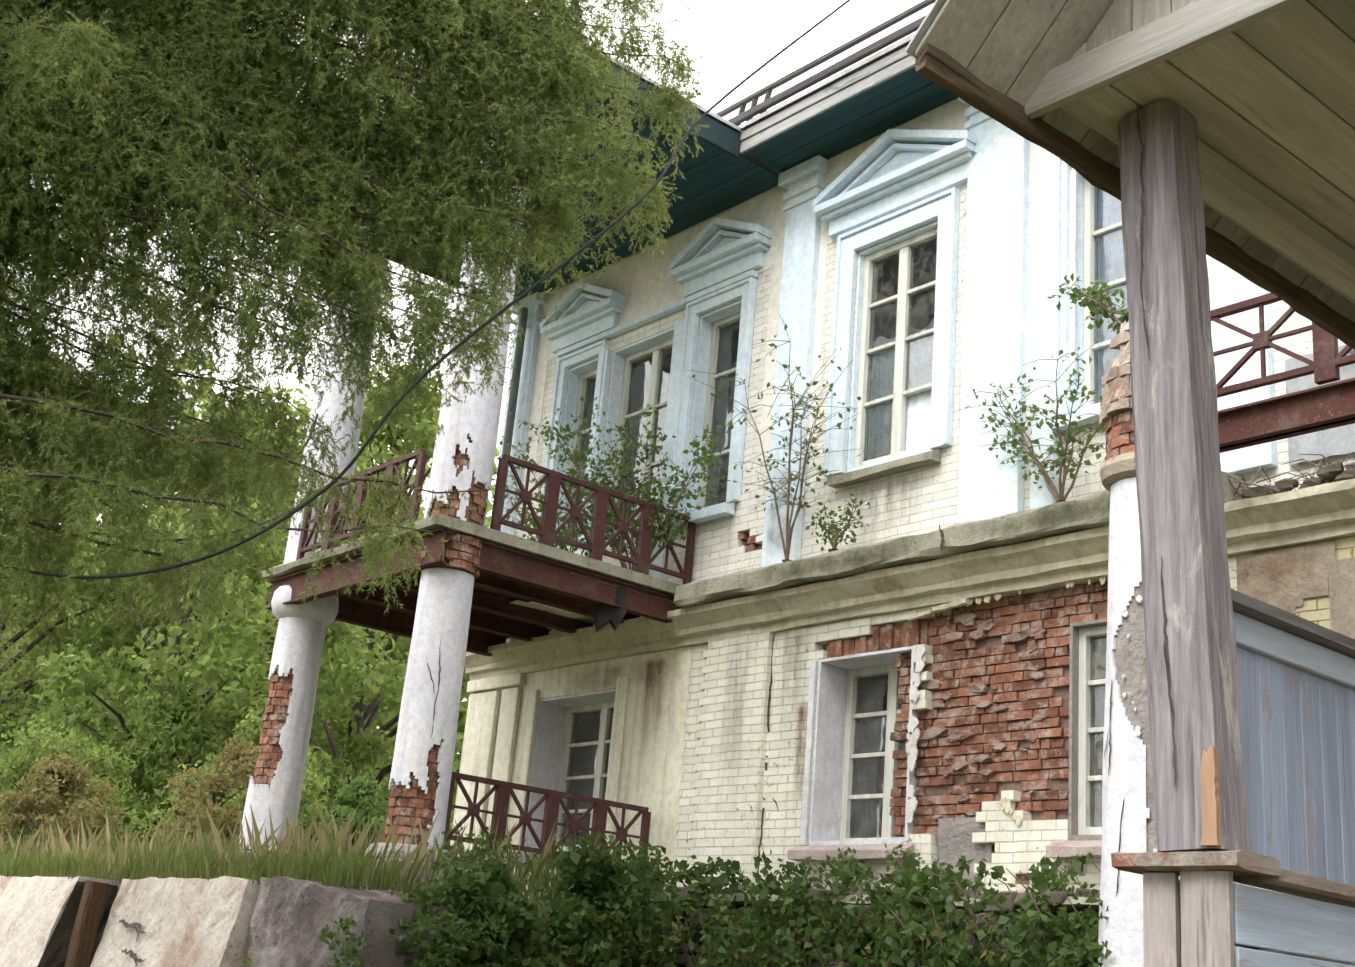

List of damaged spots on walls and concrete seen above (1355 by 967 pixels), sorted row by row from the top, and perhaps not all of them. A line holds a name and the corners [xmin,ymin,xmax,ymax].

crack [1137,103,1150,360]
flaking render [430,445,487,526]
flaking render [253,665,294,788]
flaking render [384,739,443,847]
crack [757,636,779,884]
flaking render [823,576,1157,884]